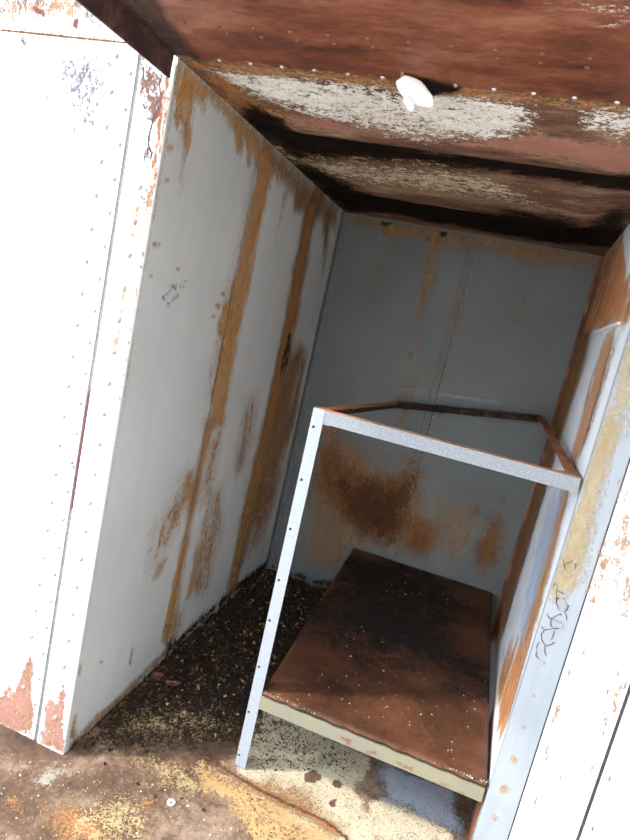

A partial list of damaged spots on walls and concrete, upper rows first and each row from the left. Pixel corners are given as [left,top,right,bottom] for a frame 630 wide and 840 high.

corrosion [417,78,630,114]
corrosion [446,130,630,173]
corrosion [68,0,398,840]
corrosion [578,480,630,661]
corrosion [487,482,570,776]
peeling [0,656,68,755]
corrosion [603,669,626,729]
corrosion [42,787,158,840]
corrosion [467,788,486,840]